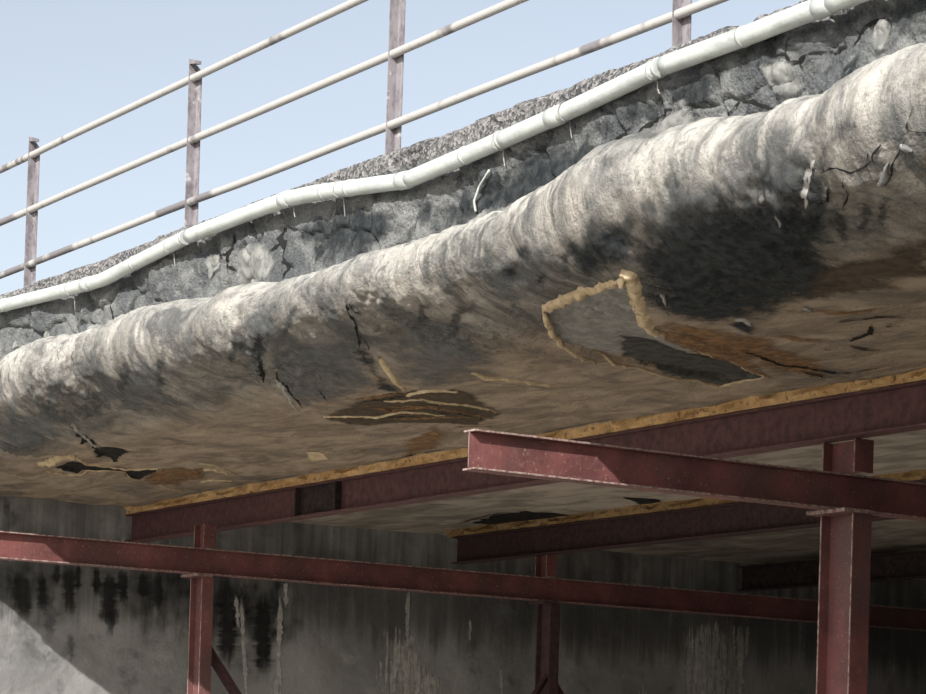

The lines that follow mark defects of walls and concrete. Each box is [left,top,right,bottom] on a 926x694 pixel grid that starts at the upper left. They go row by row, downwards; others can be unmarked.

crack [763,17,892,69]
crack [615,96,697,140]
crack [727,99,775,116]
crack [866,107,926,185]
damp [562,216,633,274]
damp [640,153,926,321]
spalling [541,269,770,388]
flaking render [257,349,498,426]
spalling [37,422,228,485]
damp [1,564,81,613]
damp [92,568,128,629]
damp [213,577,289,694]